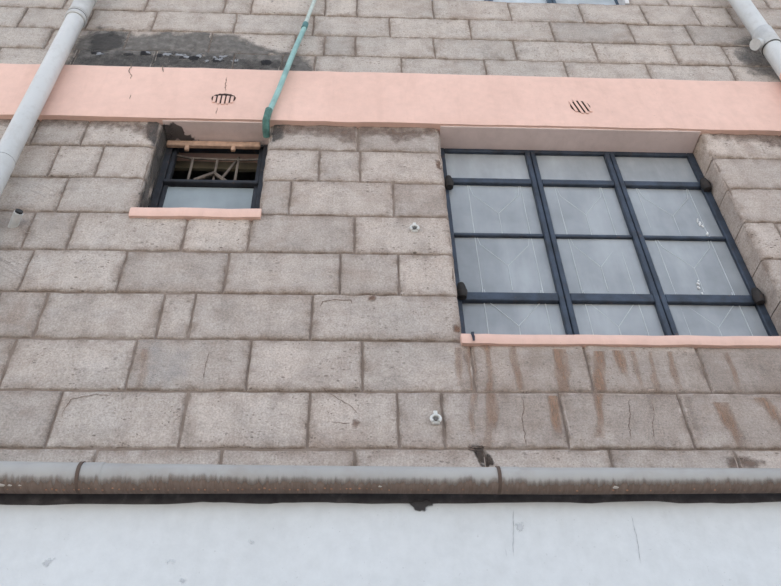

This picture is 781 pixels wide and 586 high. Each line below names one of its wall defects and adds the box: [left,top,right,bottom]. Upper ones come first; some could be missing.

leakage [68,27,312,71]